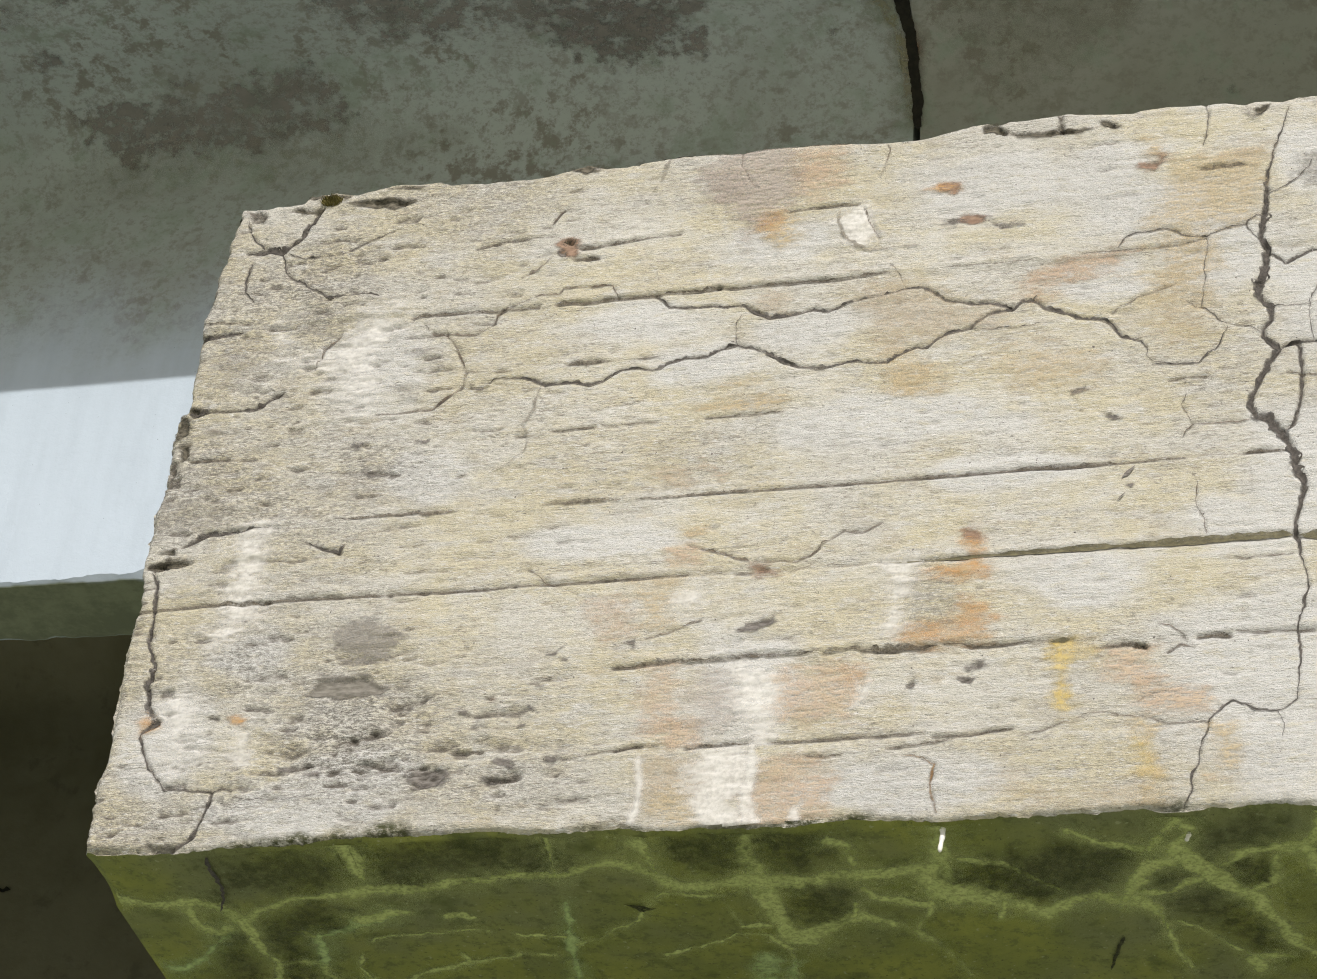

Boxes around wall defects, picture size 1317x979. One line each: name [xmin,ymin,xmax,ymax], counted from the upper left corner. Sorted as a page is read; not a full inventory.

crack [894,0,924,128]
corrosion [933,183,960,194]
crack [205,215,395,343]
corrosion [556,237,579,257]
crack [190,393,284,463]
crack [380,107,1317,808]
crack [188,526,263,547]
crack [295,511,457,554]
corrosion [940,529,986,577]
crack [138,547,751,912]
damp [676,658,786,827]
damp [628,760,642,823]